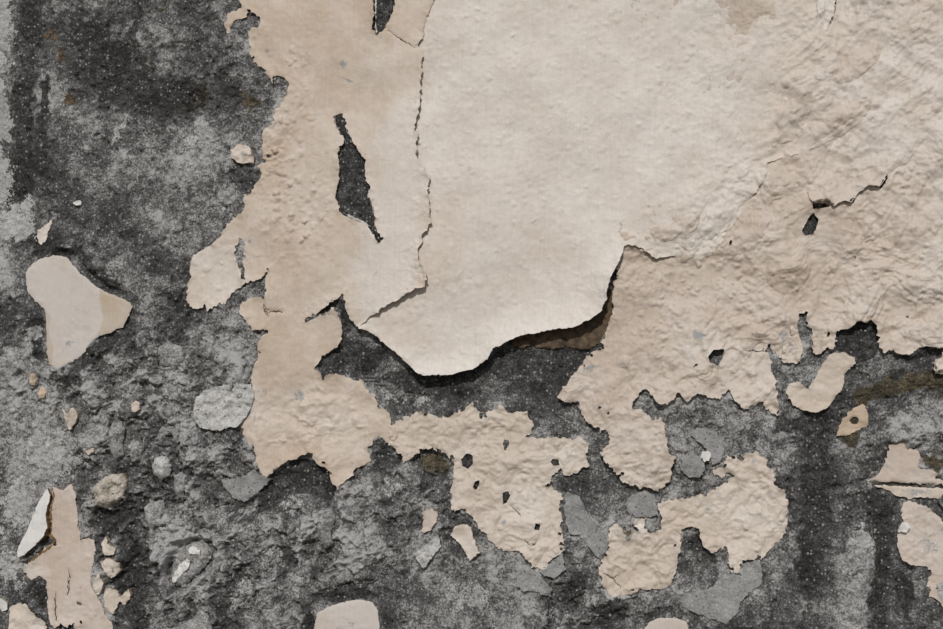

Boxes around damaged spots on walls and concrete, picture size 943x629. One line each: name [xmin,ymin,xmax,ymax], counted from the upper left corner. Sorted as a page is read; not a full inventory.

peeling [35,219,53,245]
flaking render [26,255,133,368]
peeling [186,0,943,625]
peeling [29,373,48,398]
peeling [62,408,79,430]
peeling [0,484,133,629]
peeling [172,546,201,584]
flaking render [644,617,688,629]